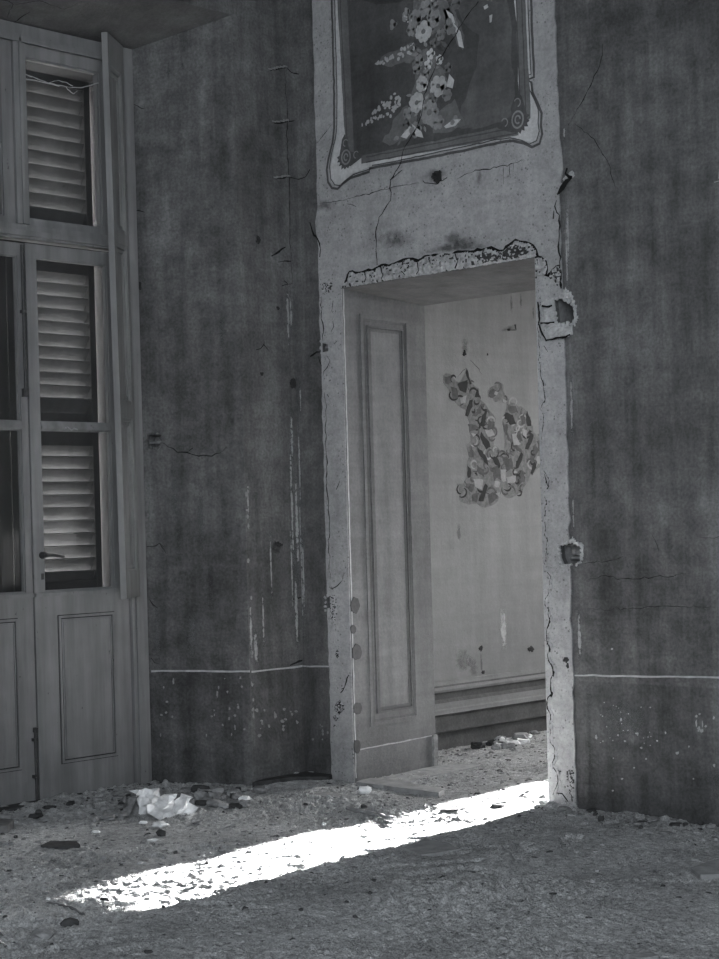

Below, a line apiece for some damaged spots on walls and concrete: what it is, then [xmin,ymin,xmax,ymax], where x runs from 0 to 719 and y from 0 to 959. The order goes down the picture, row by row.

crack [271,239,292,286]
crack [268,65,310,212]
crack [324,2,478,259]
spalling [321,239,578,338]
crack [460,160,521,184]
crack [553,168,575,267]
crack [537,286,570,443]
crack [543,467,568,801]